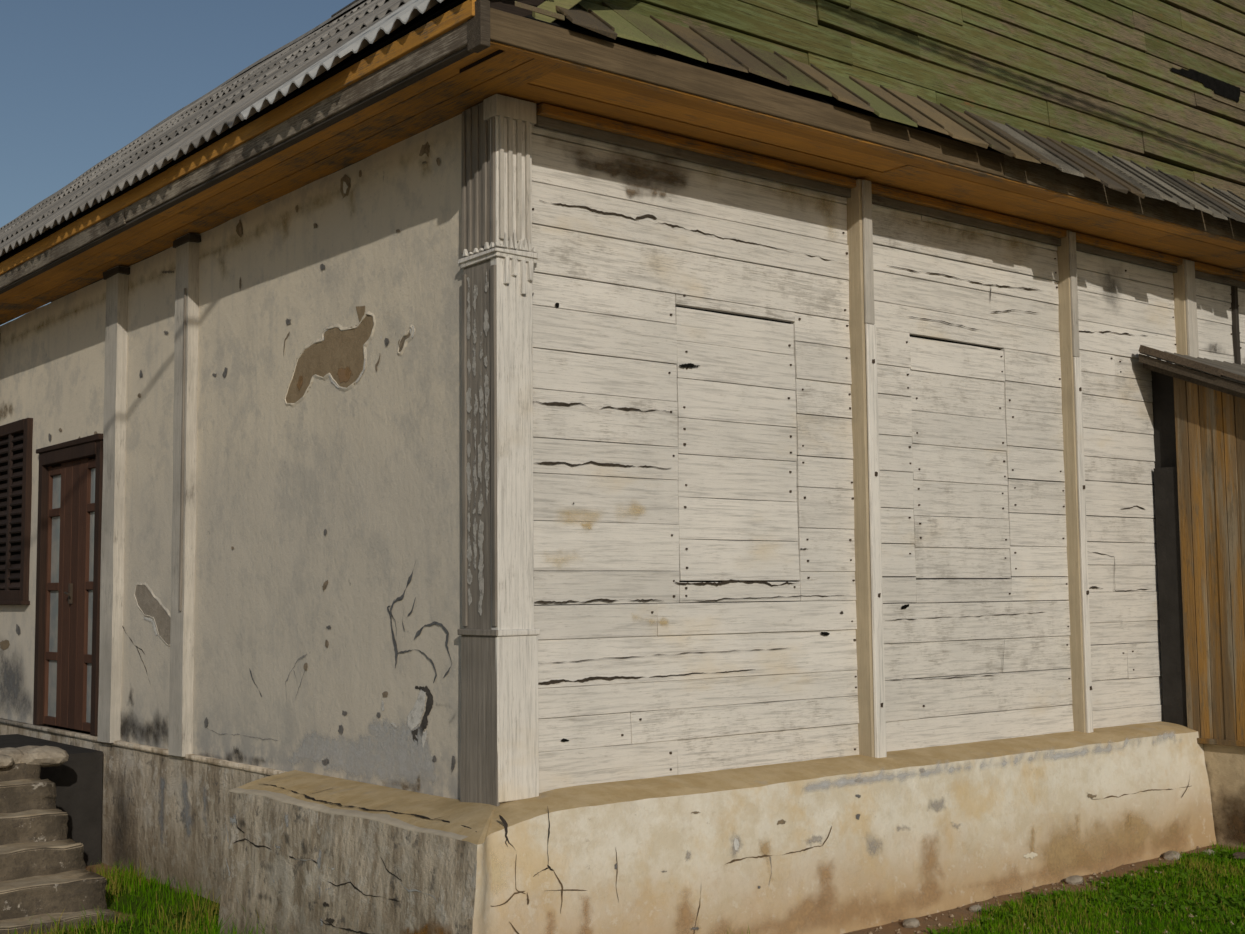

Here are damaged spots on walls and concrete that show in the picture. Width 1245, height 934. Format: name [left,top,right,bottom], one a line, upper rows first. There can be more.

damp [576,150,685,197]
peeling [285,306,415,407]
peeling [134,582,171,647]
crack [387,562,452,683]
crack [264,784,619,934]
crack [726,827,832,878]
crack [1088,779,1190,800]
damp [1213,798,1245,845]